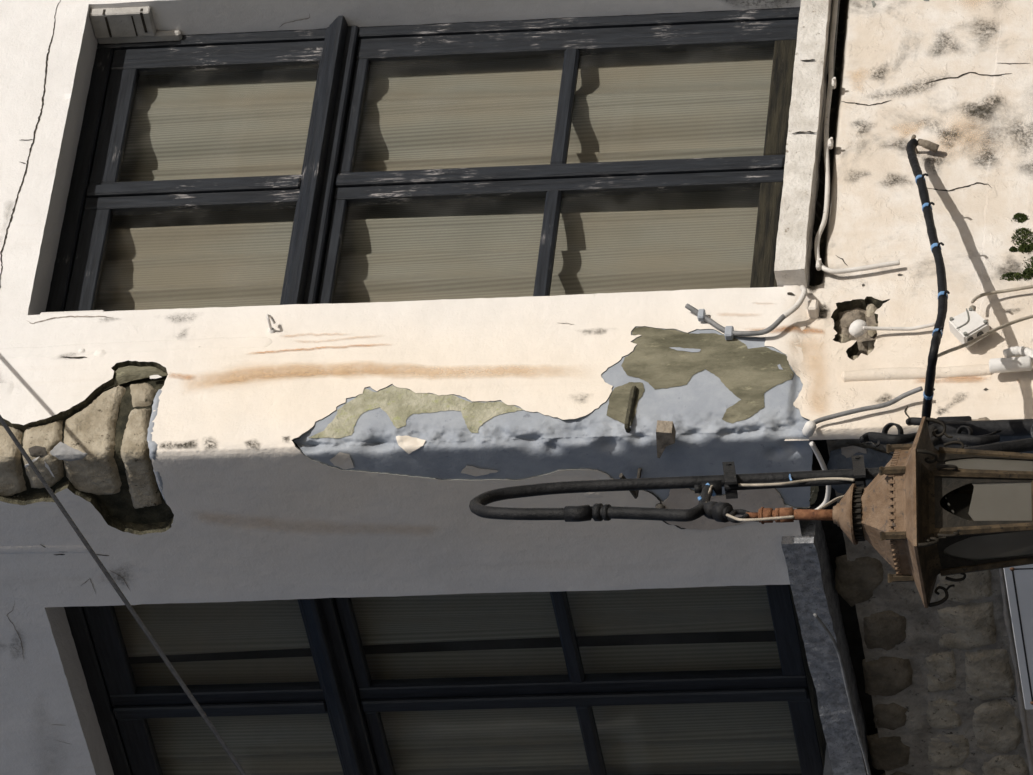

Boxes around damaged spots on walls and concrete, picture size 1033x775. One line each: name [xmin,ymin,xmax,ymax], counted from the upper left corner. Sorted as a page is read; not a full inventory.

crack [0,0,61,288]
crack [928,72,1011,83]
water stain [966,97,1000,118]
spalling [831,284,890,360]
spalling [0,360,174,535]
flaking render [292,326,819,530]